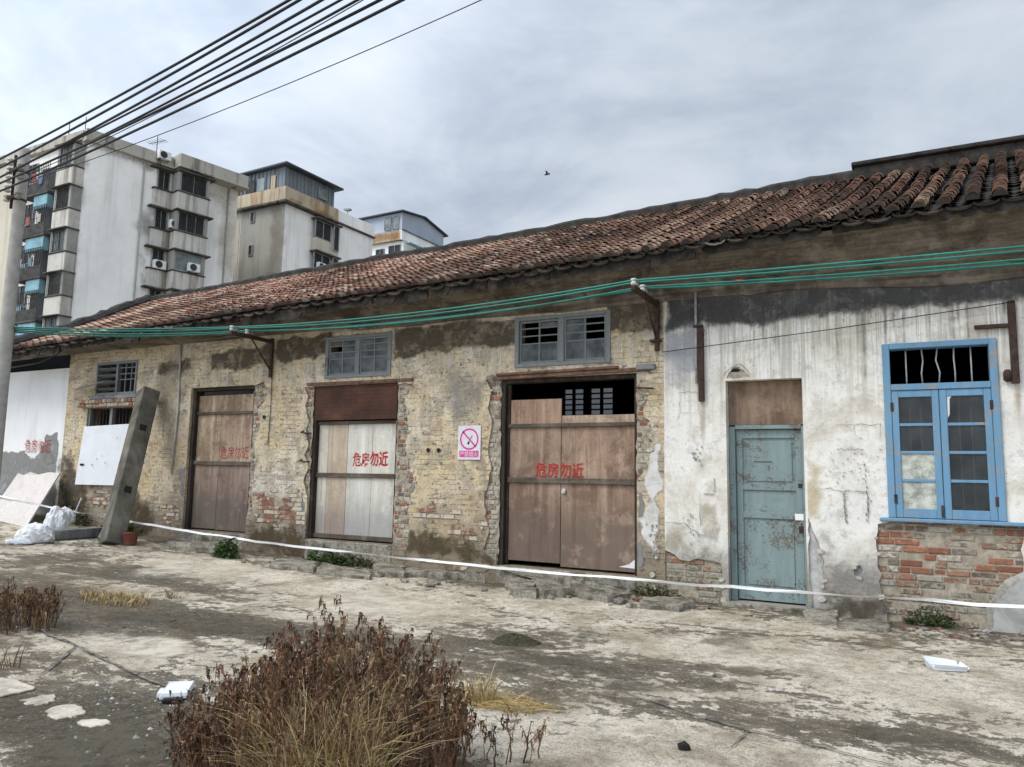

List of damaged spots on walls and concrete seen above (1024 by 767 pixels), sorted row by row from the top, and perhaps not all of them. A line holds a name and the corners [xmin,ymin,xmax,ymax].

water stain [394,320,515,368]
rust [693,324,705,402]
water stain [607,278,1024,375]
peeling [247,382,315,538]
spalling [393,380,502,571]
spalling [643,523,727,605]